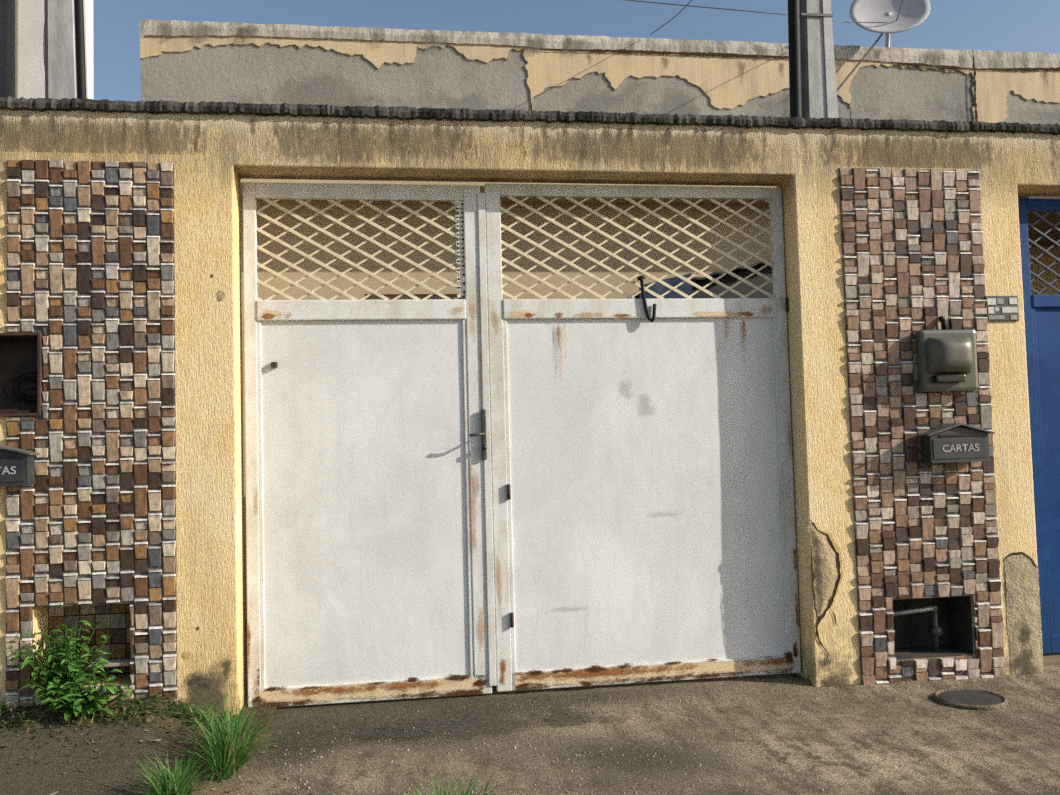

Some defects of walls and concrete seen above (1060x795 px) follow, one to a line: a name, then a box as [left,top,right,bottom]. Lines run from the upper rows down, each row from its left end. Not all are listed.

flaking render [140,42,790,118]
flaking render [837,64,975,122]
flaking render [1004,90,1060,125]
rust [262,310,281,319]
rust [509,310,534,318]
rust [695,311,753,327]
flaking render [808,520,843,664]
flaking render [1004,552,1044,674]
leakage [187,661,230,714]
rust [247,625,487,707]
rust [500,643,798,691]